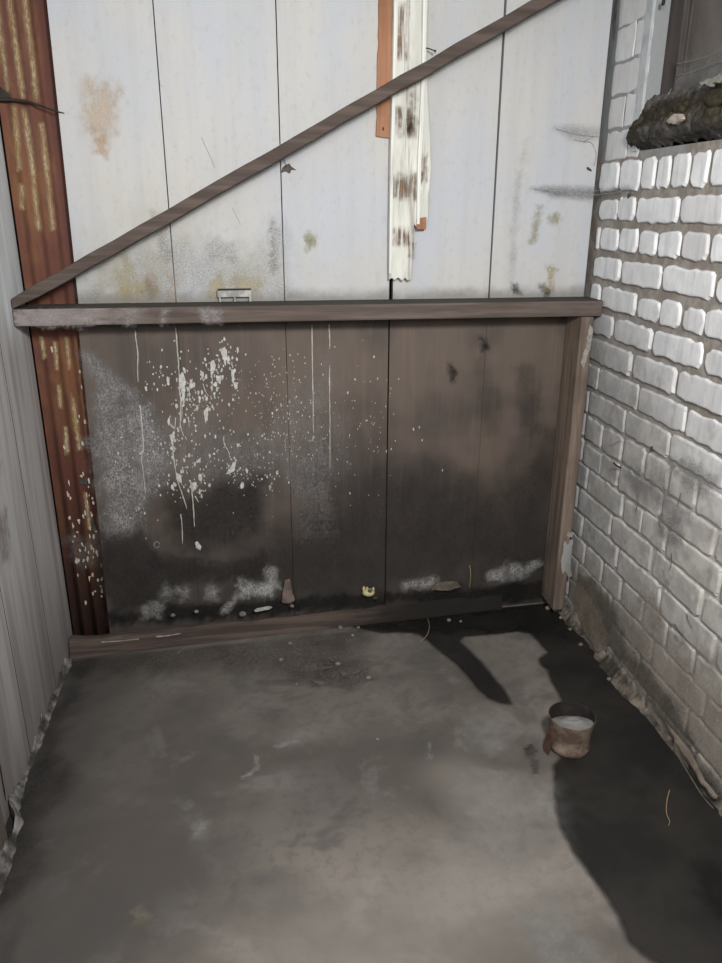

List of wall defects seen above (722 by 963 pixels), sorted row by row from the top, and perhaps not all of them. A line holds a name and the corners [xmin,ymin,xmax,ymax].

water stain [83,354,722,963]